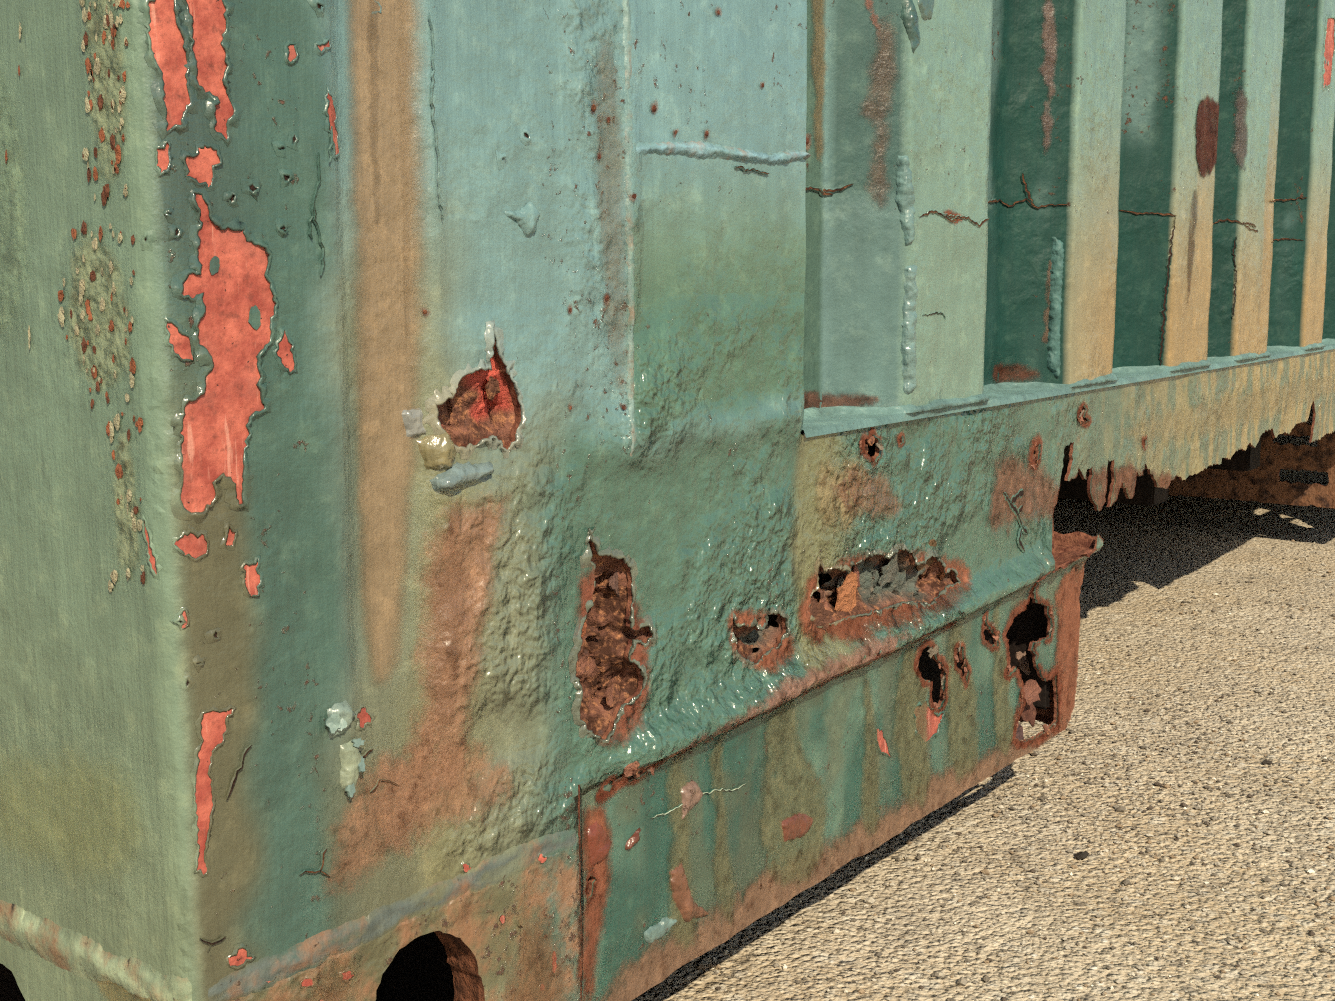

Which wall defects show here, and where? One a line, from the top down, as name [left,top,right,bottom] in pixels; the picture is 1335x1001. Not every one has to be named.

rust [1196,96,1219,177]
rust [1234,92,1248,167]
peeling [58,0,300,599]
rust [580,569,595,617]
peeling [190,705,237,878]
rust [607,557,1087,1001]
rust [578,777,625,997]